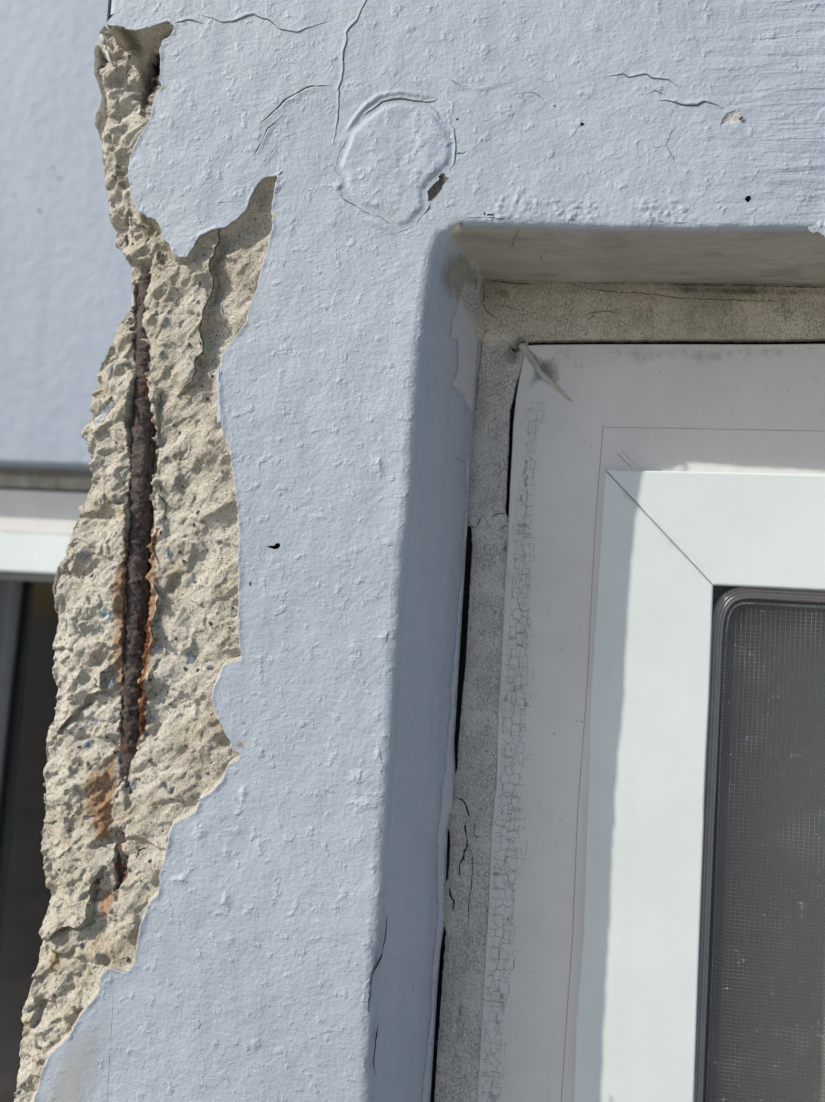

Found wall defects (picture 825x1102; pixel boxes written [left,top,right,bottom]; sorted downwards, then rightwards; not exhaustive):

crack [171,0,549,233]
crack [606,70,724,161]
corrosion [88,762,113,838]
corrosion [100,844,128,915]
corrosion [113,529,130,709]
spalling [14,18,282,1102]
corrosion [136,528,160,745]
crack [431,383,544,1102]